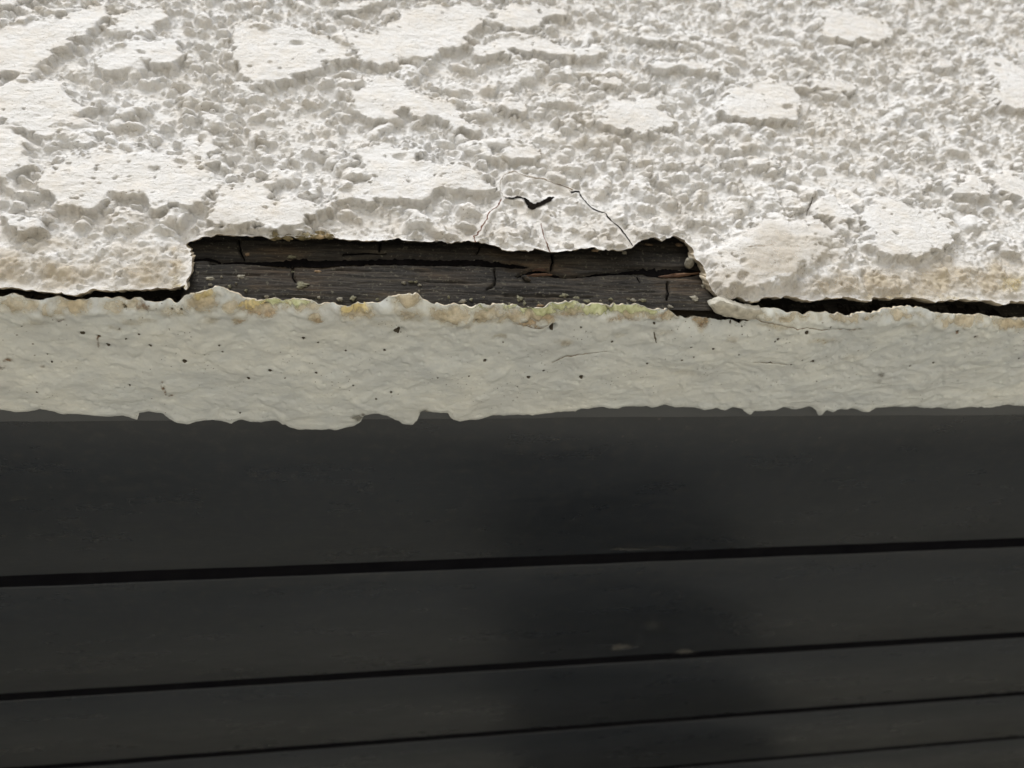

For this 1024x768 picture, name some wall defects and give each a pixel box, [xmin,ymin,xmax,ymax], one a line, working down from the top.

crack [473,171,633,289]
spalling [249,230,763,327]
water stain [170,289,322,324]
water stain [341,302,374,319]
water stain [396,293,421,318]
water stain [431,305,584,328]
crack [723,302,1011,331]